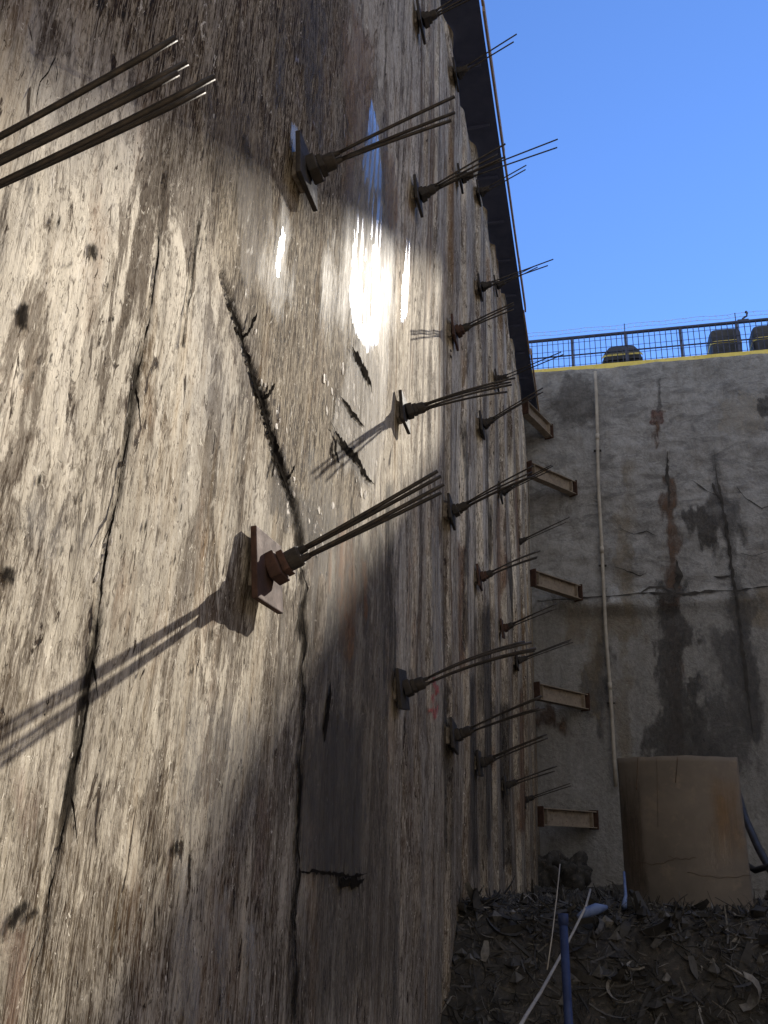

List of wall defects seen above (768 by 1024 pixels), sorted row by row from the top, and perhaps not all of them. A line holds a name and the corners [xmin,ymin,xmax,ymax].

crack [31,153,169,1019]
crack [222,276,309,1022]
crack [537,458,768,741]
corrosion [650,380,683,606]
leakage [640,581,760,773]
leakage [681,506,722,550]